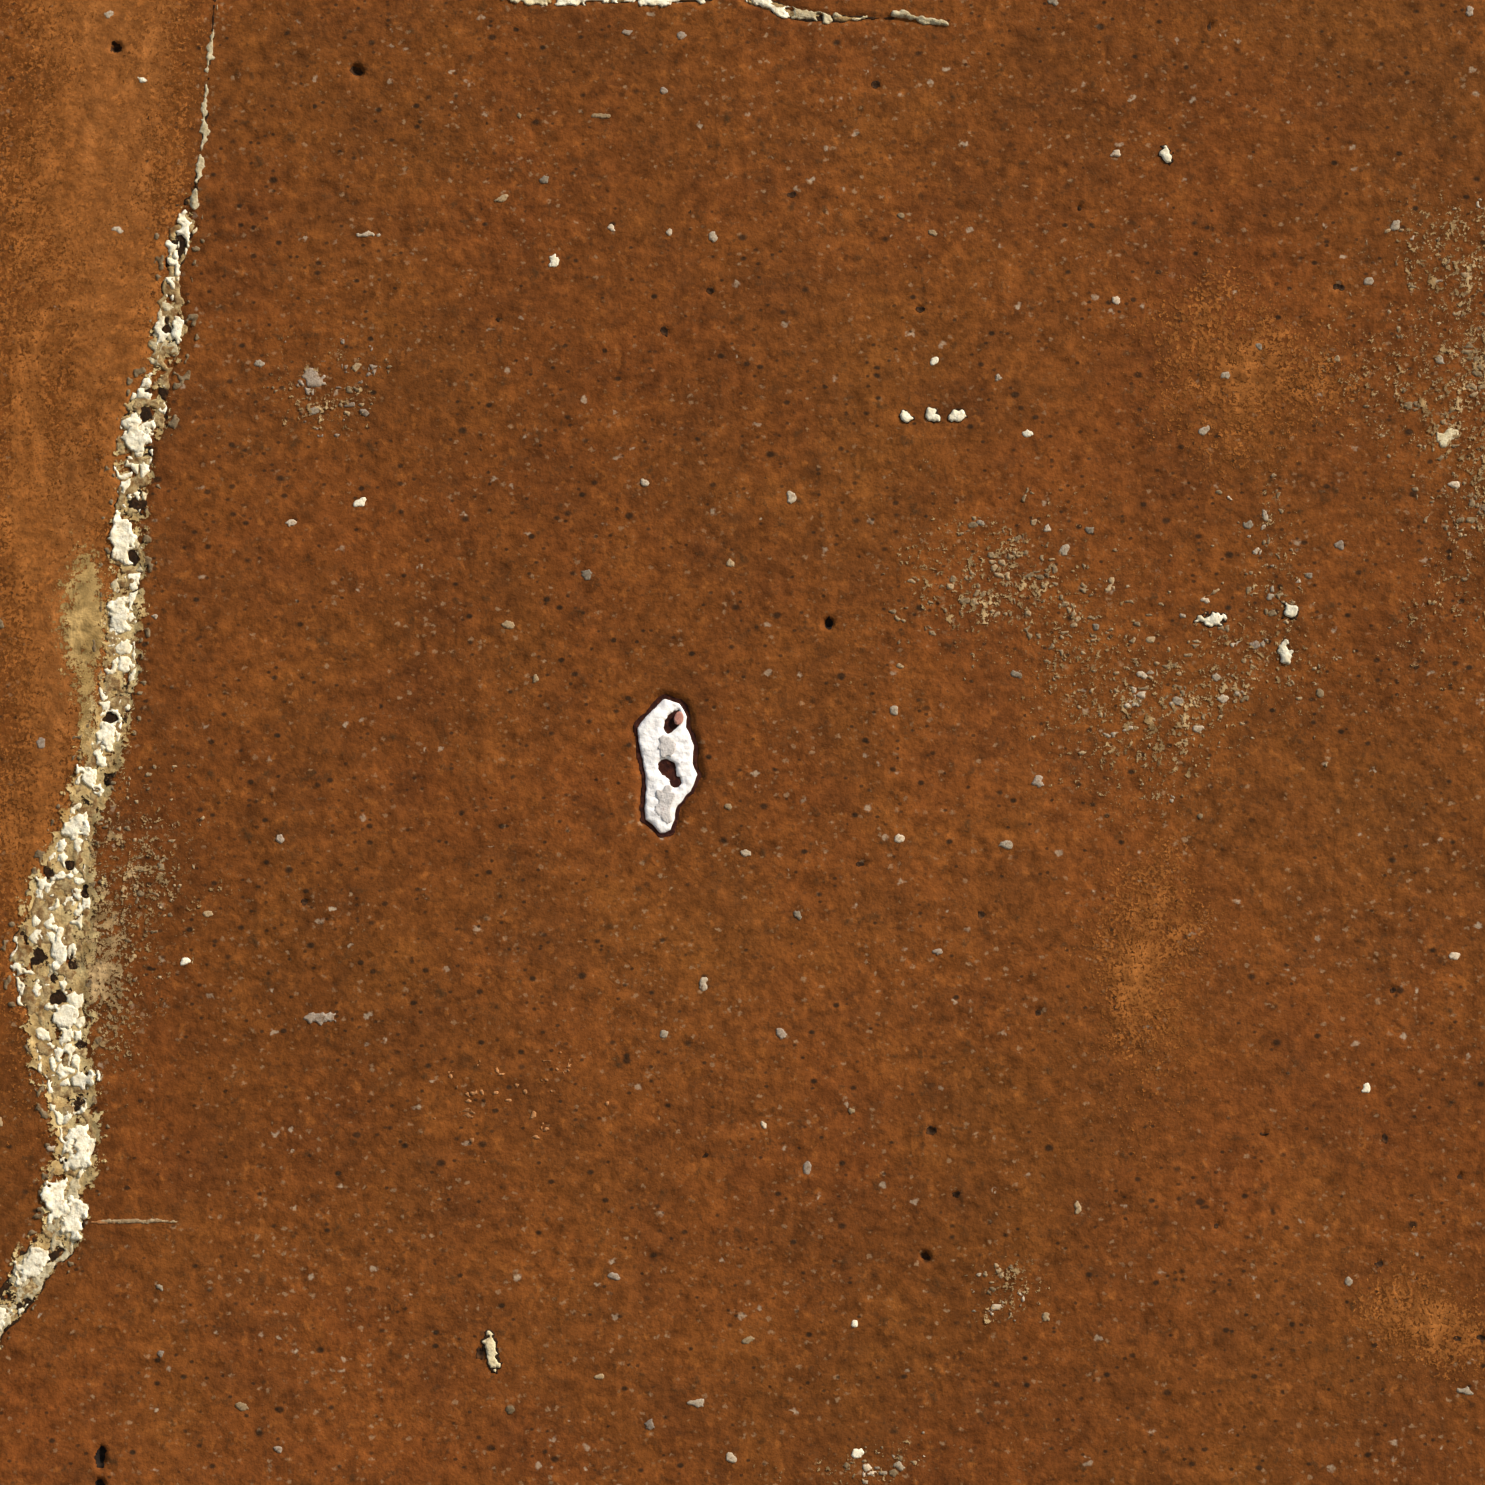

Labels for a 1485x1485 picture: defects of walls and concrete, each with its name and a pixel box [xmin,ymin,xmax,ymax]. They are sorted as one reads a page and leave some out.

crack [510,0,949,26]
crack [0,0,218,1349]
spalling [633,694,702,838]